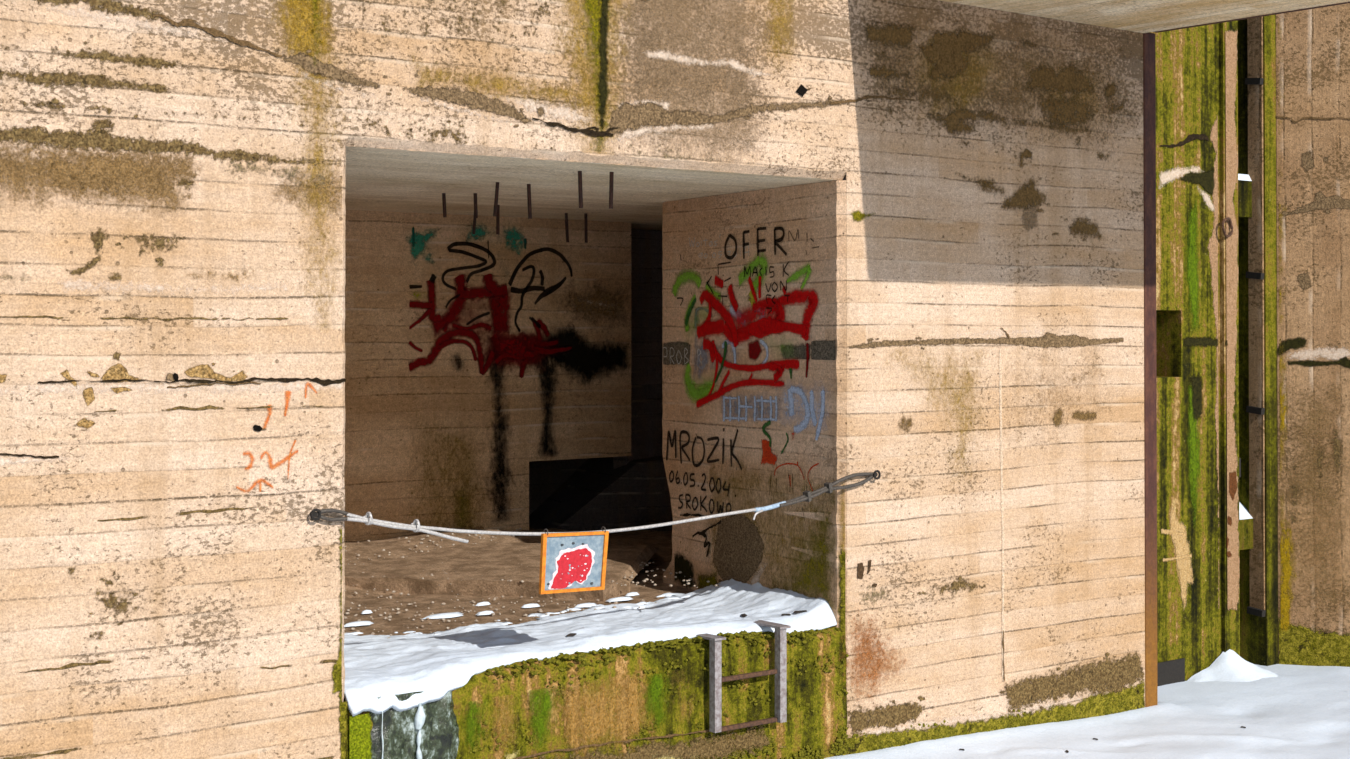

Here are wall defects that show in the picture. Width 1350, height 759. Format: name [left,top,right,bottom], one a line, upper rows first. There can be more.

damp [281,0,332,233]
crack [532,118,618,137]
damp [466,0,763,160]
damp [872,31,1132,141]
damp [0,142,197,212]
spalling [1160,167,1214,209]
spalling [60,352,142,429]
crack [36,377,346,393]
spalling [165,363,248,382]
spalling [1277,337,1350,368]
crack [0,453,59,466]
rust [852,628,893,697]